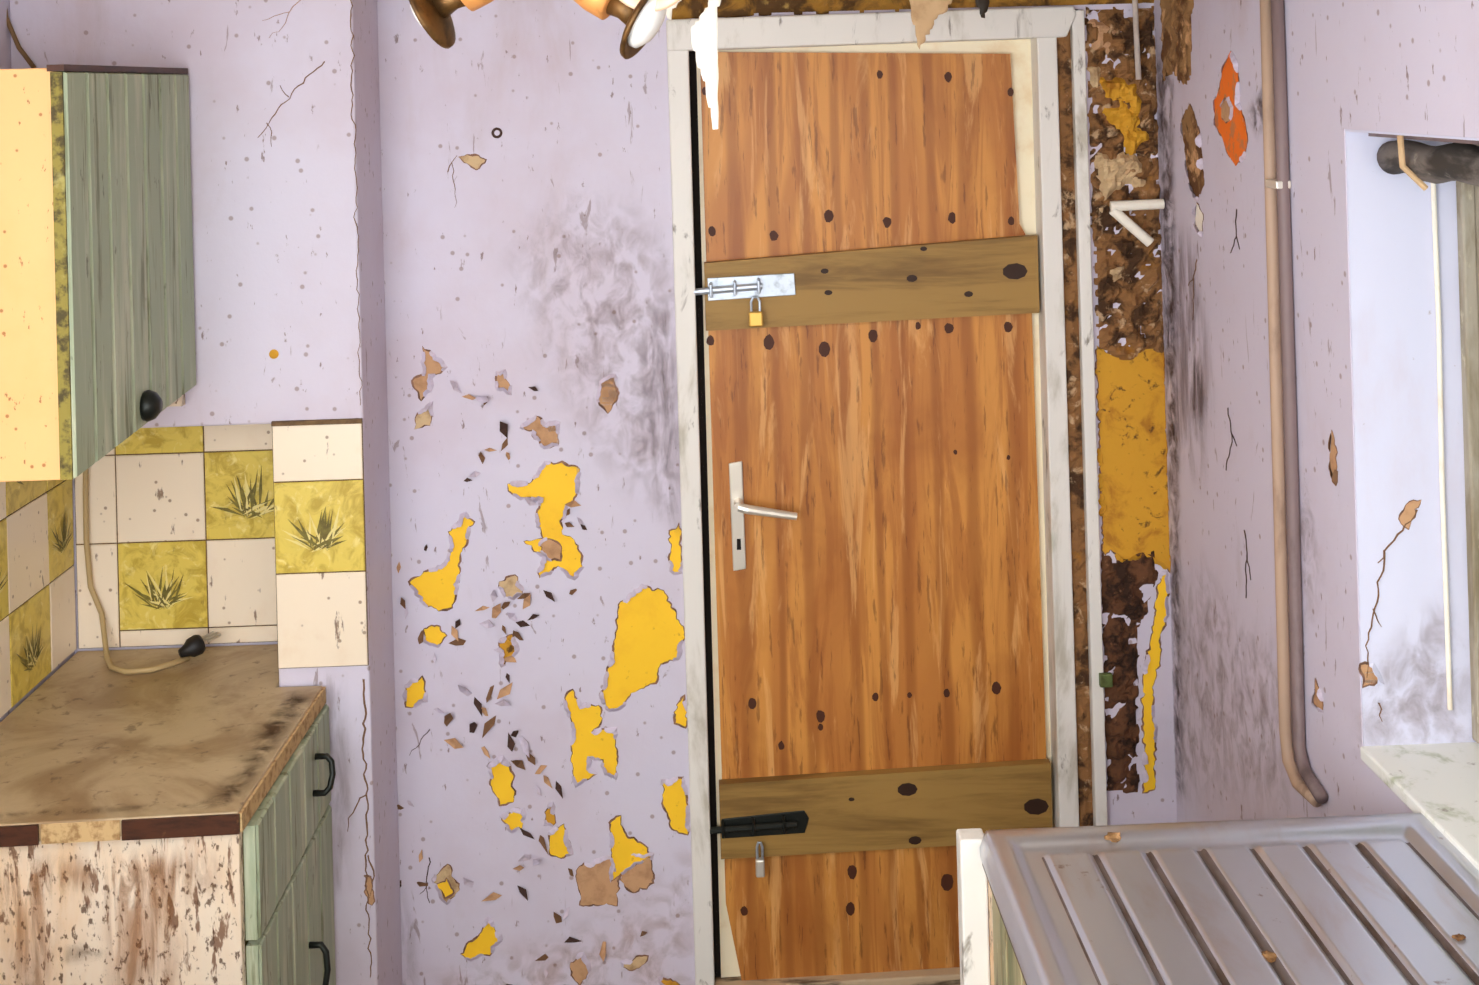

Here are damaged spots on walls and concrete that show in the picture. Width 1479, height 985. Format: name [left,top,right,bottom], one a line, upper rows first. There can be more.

peeling [1179,51,1248,238]
water stain [1158,75,1175,377]
peeling [411,346,538,429]
flaking render [1084,0,1194,794]
water stain [1168,399,1177,493]
peeling [1328,430,1338,486]
peeling [1398,500,1421,530]
crack [1365,509,1418,722]
peeling [397,415,685,985]
peeling [673,694,688,729]
peeling [1358,661,1384,688]
peeling [660,776,691,835]